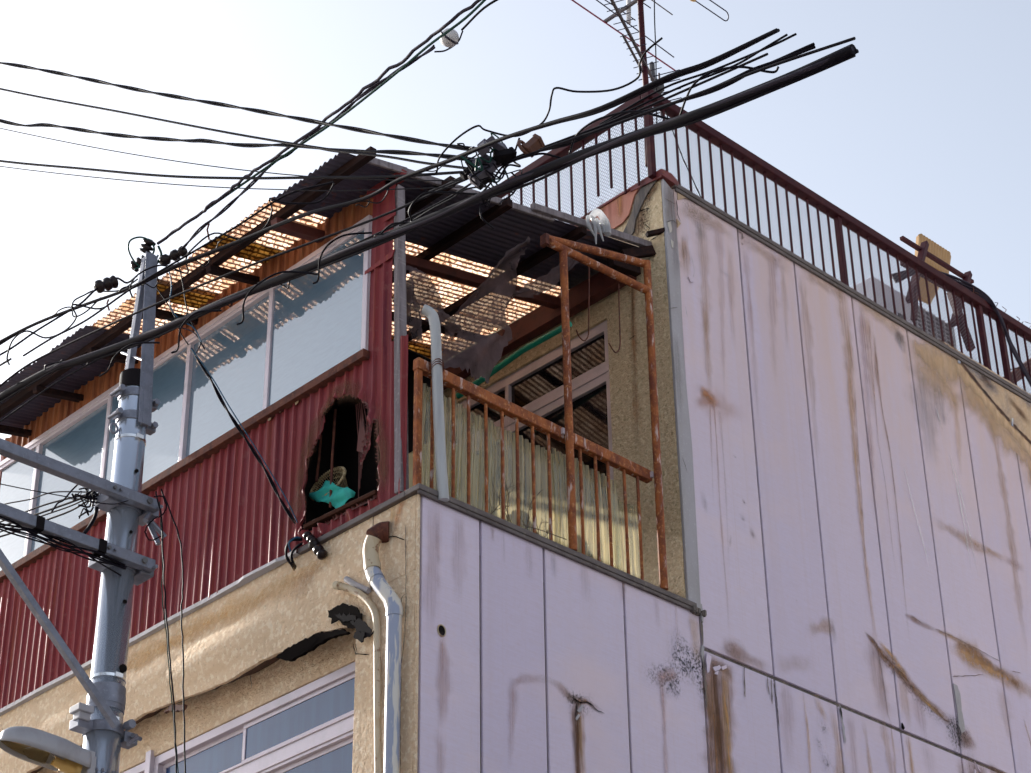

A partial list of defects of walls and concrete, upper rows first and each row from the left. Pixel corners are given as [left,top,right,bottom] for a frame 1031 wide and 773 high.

damp [915,342,1031,472]
spalling [276,603,374,662]
damp [660,643,705,702]
rust [870,637,938,712]
rust [959,646,1017,685]
rust [568,694,587,773]
rust [706,663,731,773]